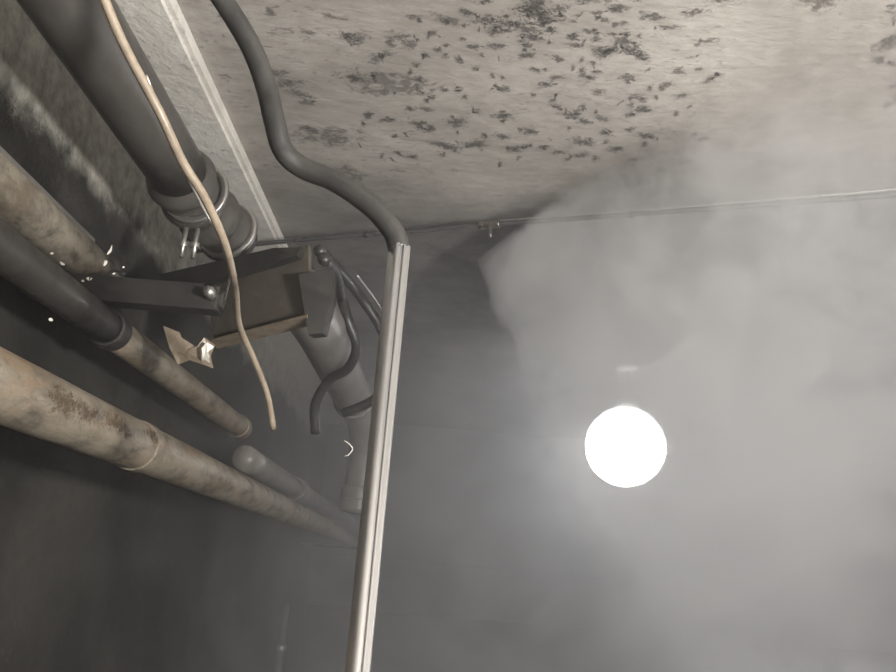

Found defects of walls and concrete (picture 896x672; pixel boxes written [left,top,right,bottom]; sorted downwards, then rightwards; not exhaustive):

water stain [350,43,599,160]
water stain [459,0,650,152]
water stain [617,68,701,147]
water stain [872,4,896,66]